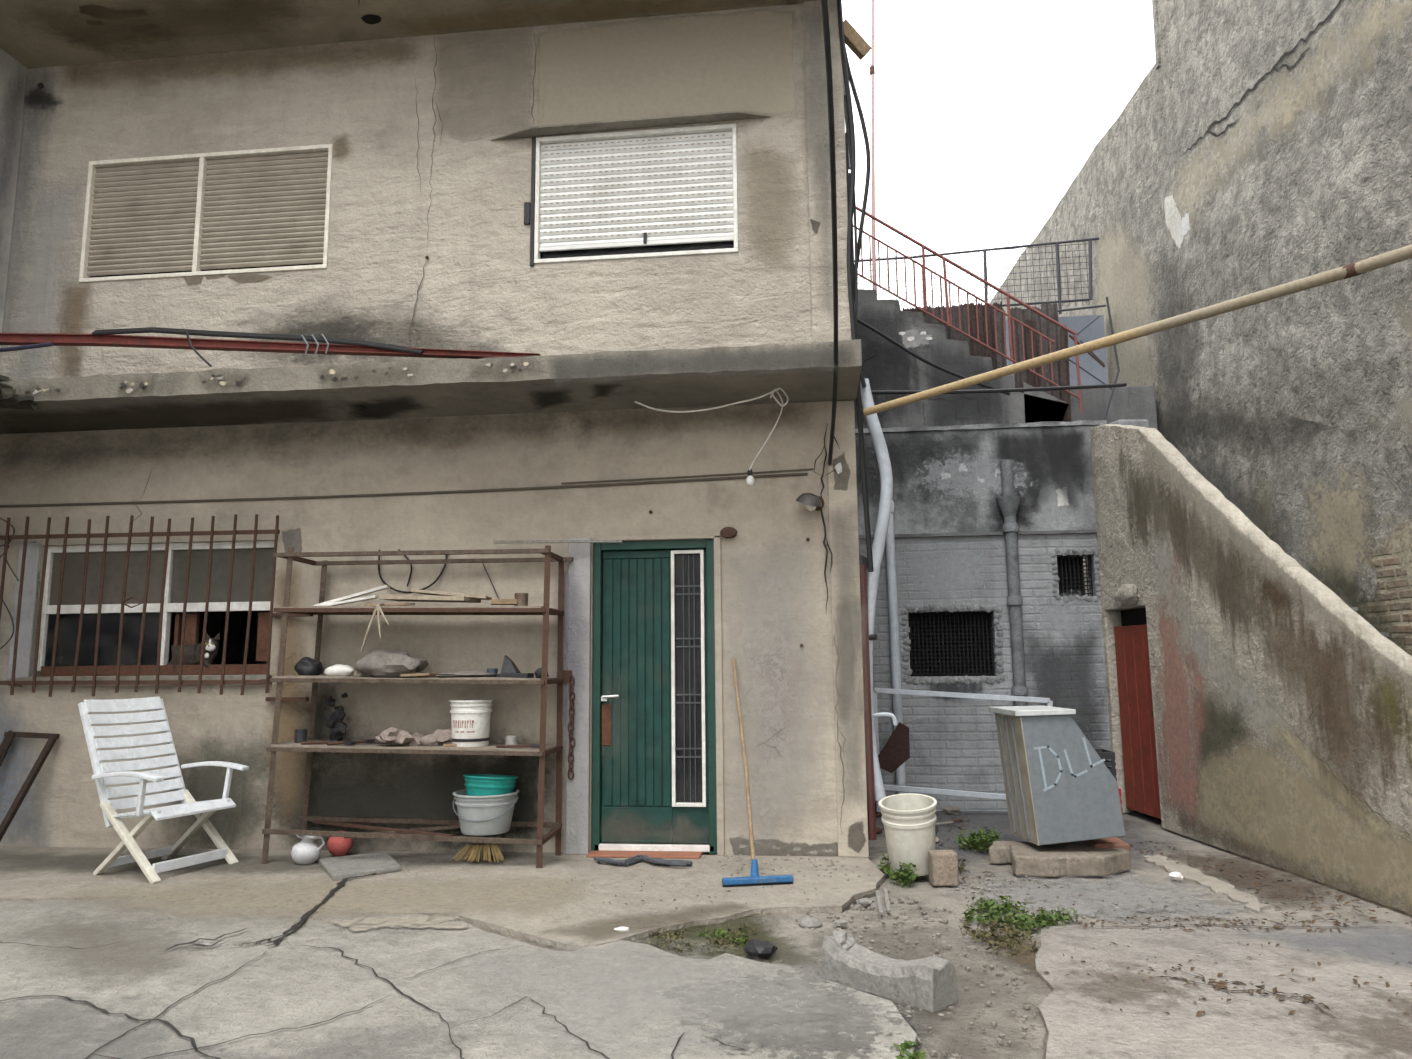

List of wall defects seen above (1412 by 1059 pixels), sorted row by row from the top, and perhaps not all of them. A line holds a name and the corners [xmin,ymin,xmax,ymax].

crack [1184,0,1342,154]
flaking render [1160,0,1412,249]
water stain [932,350,997,424]
water stain [994,433,1081,530]
water stain [1157,406,1321,443]
water stain [1120,460,1399,800]
water stain [1171,818,1325,904]
flaking render [1196,729,1412,912]
crack [0,873,610,1059]
crack [671,1032,763,1059]